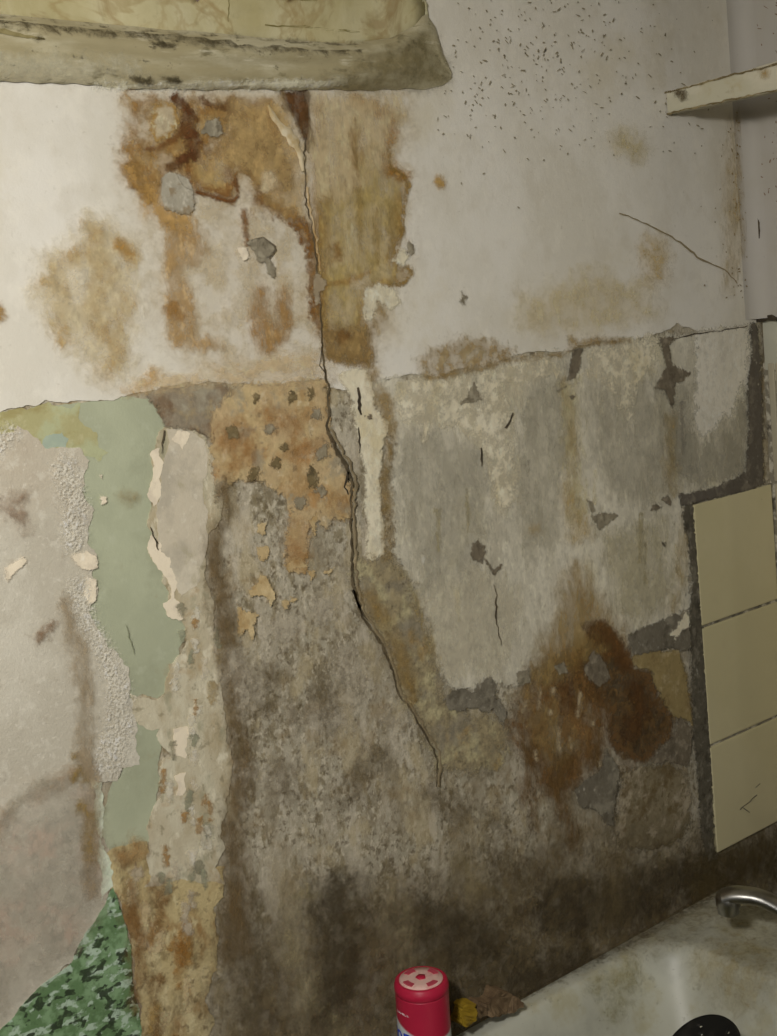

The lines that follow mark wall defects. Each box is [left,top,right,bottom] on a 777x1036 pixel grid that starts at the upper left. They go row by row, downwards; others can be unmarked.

peeling [95,78,348,91]
damp [444,0,600,138]
damp [549,0,668,147]
damp [40,221,139,372]
damp [122,77,412,388]
crack [303,130,443,787]
damp [376,393,395,432]
damp [422,336,509,379]
crack [619,213,737,283]
crack [657,315,777,344]
peeling [0,322,765,1036]
damp [209,524,777,1036]